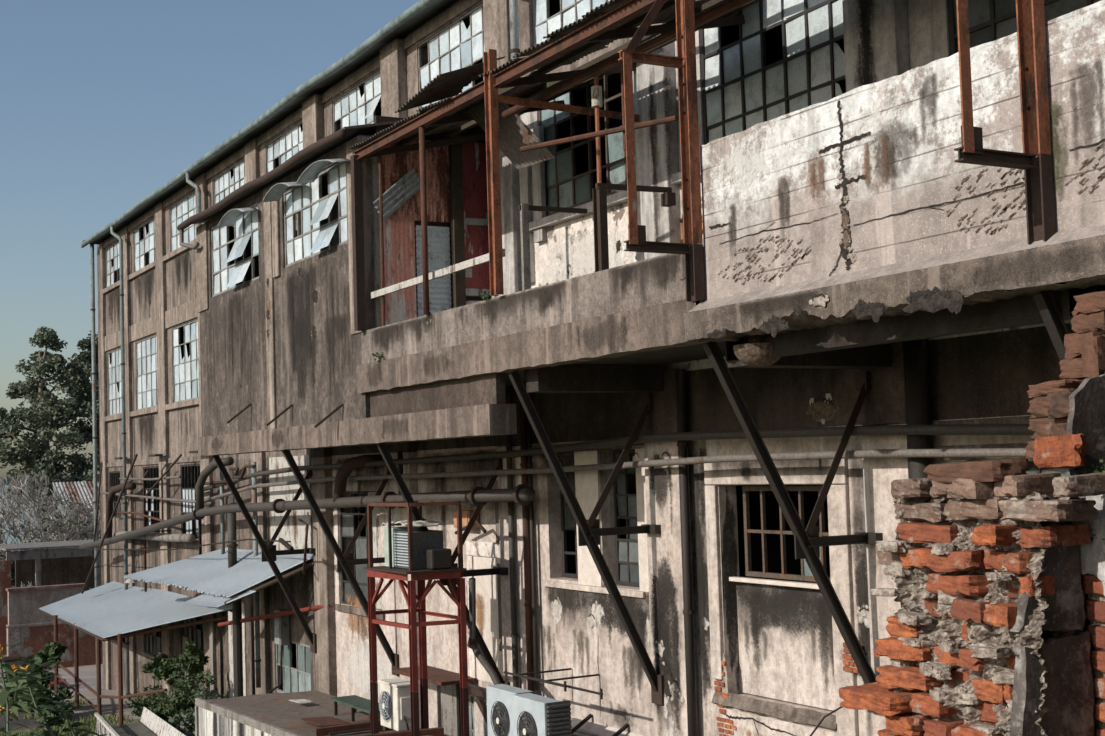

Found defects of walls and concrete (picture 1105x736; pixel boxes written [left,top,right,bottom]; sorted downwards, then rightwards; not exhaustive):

leakage [856,0,876,86]
leakage [871,74,936,181]
leakage [1070,60,1104,158]
crack [709,100,1023,277]
leakage [287,267,352,399]
spalling [759,314,789,337]
spalling [809,293,829,307]
spalling [852,299,888,322]
spalling [902,286,963,314]
leakage [744,594,766,665]
leakage [811,603,834,684]
spalling [714,653,737,736]